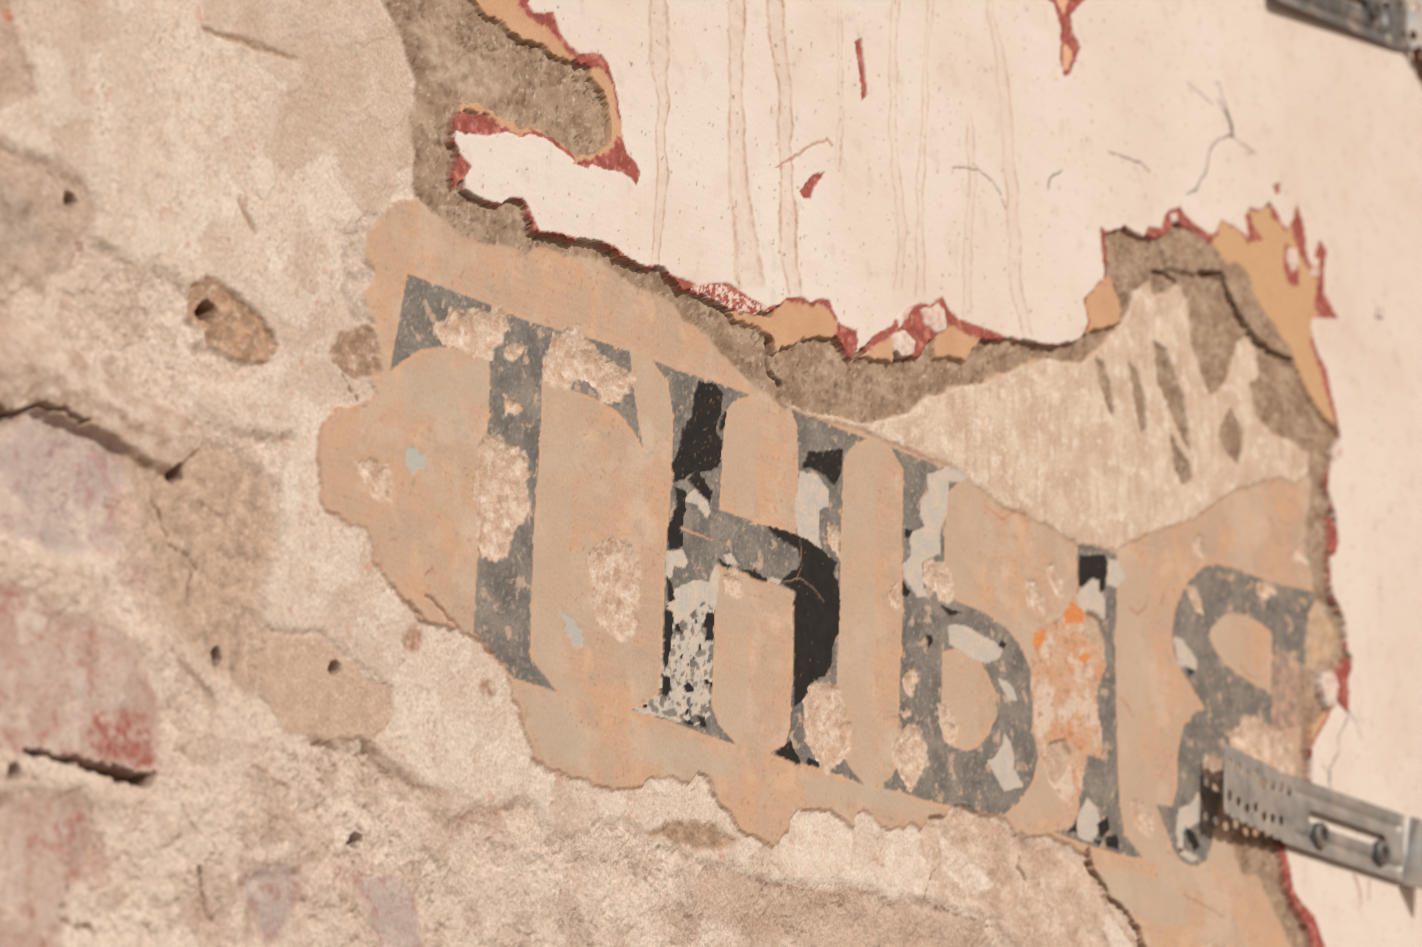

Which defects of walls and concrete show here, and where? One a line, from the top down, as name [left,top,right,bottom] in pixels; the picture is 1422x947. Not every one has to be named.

spalling [186,276,280,363]
spalling [329,205,387,379]
crack [0,401,89,424]
spalling [382,0,1354,805]
spalling [354,446,427,503]
crack [22,748,157,786]
spalling [647,820,737,851]